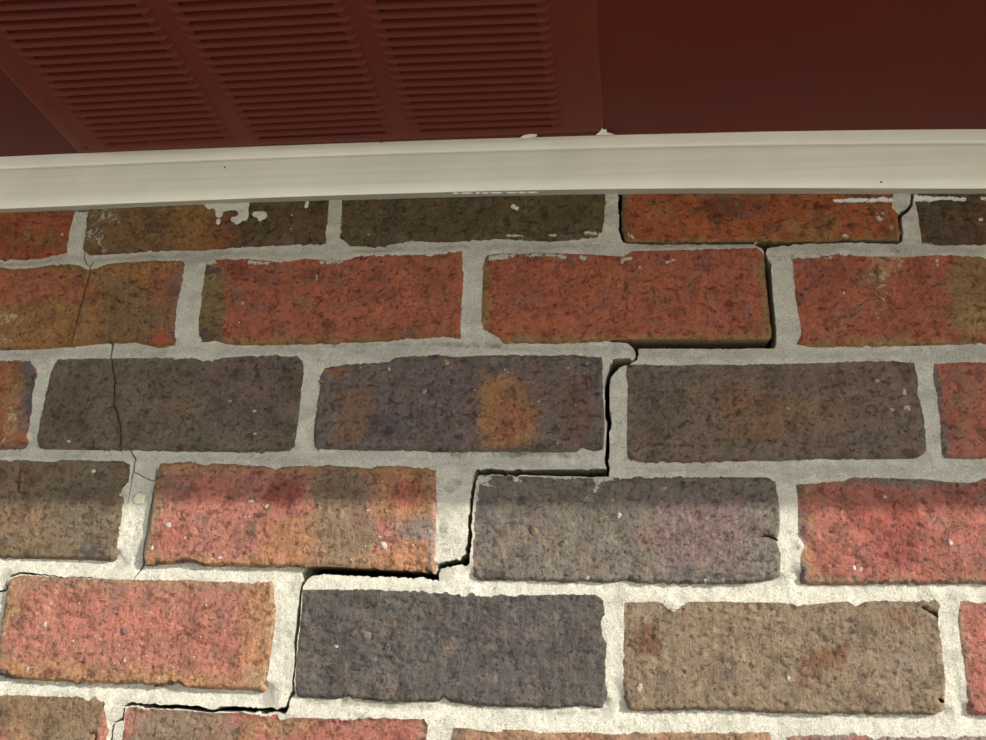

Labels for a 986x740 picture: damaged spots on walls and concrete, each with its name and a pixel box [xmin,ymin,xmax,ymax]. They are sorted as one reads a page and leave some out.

crack [71,243,94,348]
crack [108,194,914,740]
crack [0,572,92,592]